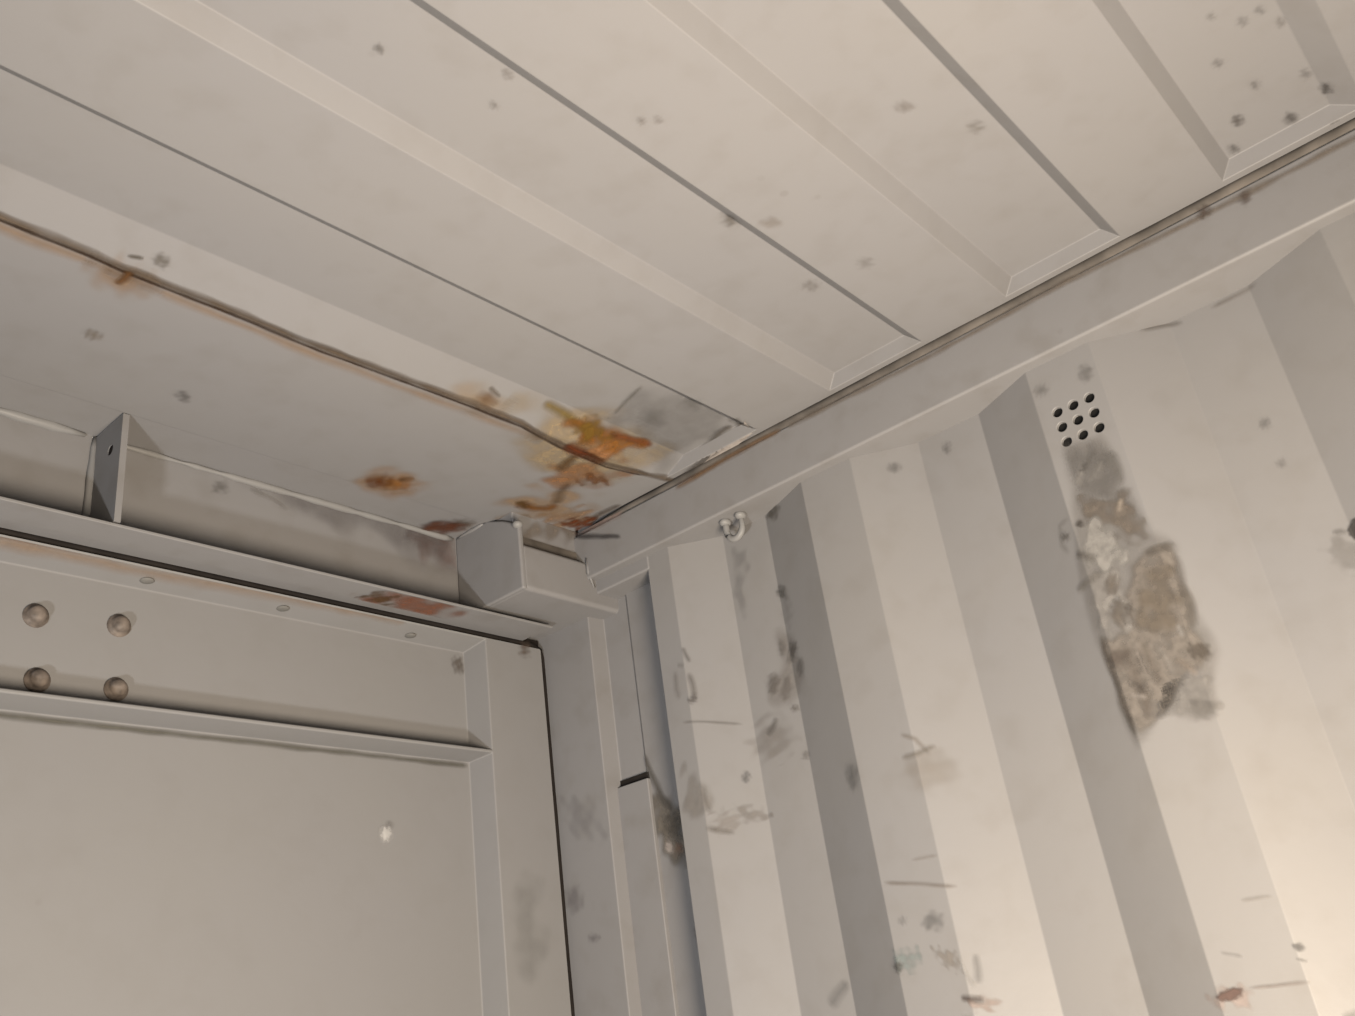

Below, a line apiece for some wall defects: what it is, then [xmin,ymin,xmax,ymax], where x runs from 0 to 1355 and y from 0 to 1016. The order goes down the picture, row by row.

corrosion [1163,141,1349,236]
corrosion [368,478,413,489]
corrosion [509,403,650,538]
corrosion [680,432,776,486]
corrosion [362,592,451,616]